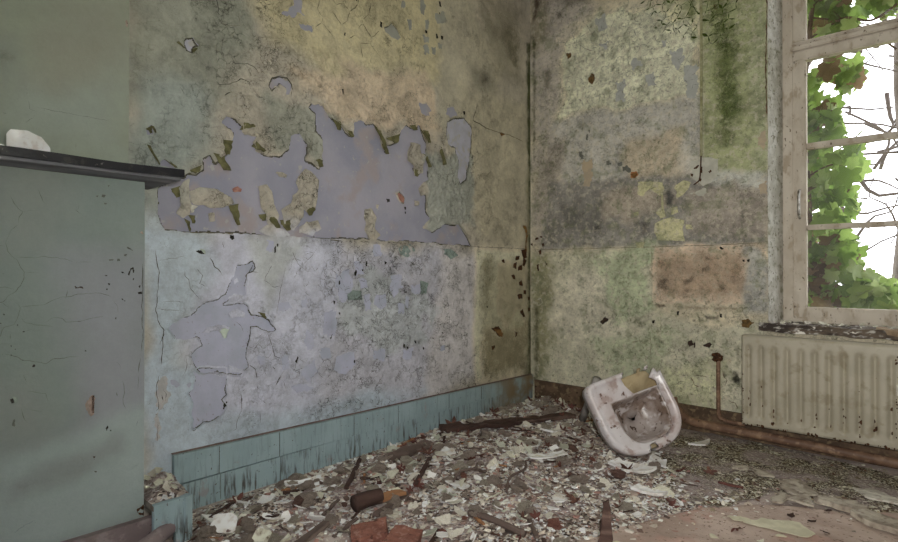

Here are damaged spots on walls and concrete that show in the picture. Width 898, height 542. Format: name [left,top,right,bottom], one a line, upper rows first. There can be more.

peeling [177,34,201,56]
crack [317,0,379,57]
peeling [420,0,447,55]
crack [556,0,738,123]
crack [762,0,770,114]
peeling [146,98,473,375]
crack [116,232,233,405]
peeling [164,257,277,431]
crack [227,323,322,430]